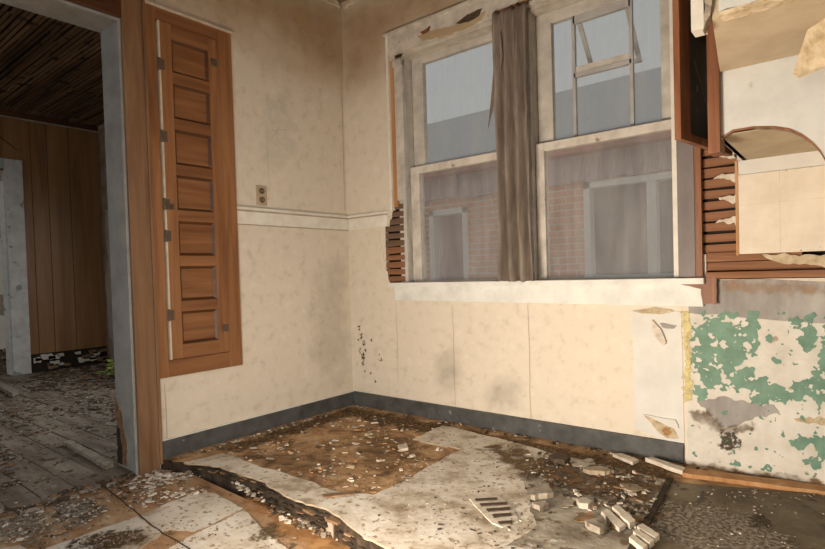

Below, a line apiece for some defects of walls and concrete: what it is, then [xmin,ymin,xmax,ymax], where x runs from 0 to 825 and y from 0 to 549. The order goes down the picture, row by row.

peeling [417,8,486,41]
spalling [388,210,402,282]
flaking render [31,210,114,373]
peeling [644,154,825,482]
leakage [218,407,449,452]
leakage [692,411,754,451]
crack [105,487,190,549]
leakage [460,428,799,549]